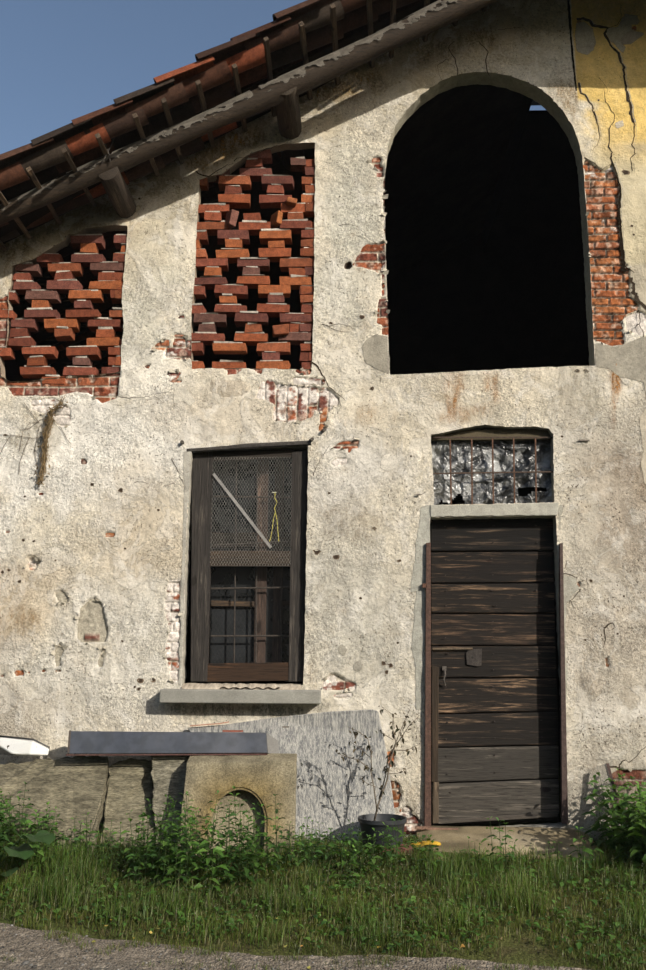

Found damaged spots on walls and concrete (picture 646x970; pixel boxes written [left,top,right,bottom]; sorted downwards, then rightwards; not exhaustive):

crack [567,0,646,337]
spalling [344,157,390,335]
spalling [582,161,646,346]
spalling [0,298,120,428]
spalling [254,368,339,431]
spalling [164,580,182,684]
flaking render [323,673,356,698]
flaking render [391,781,424,835]